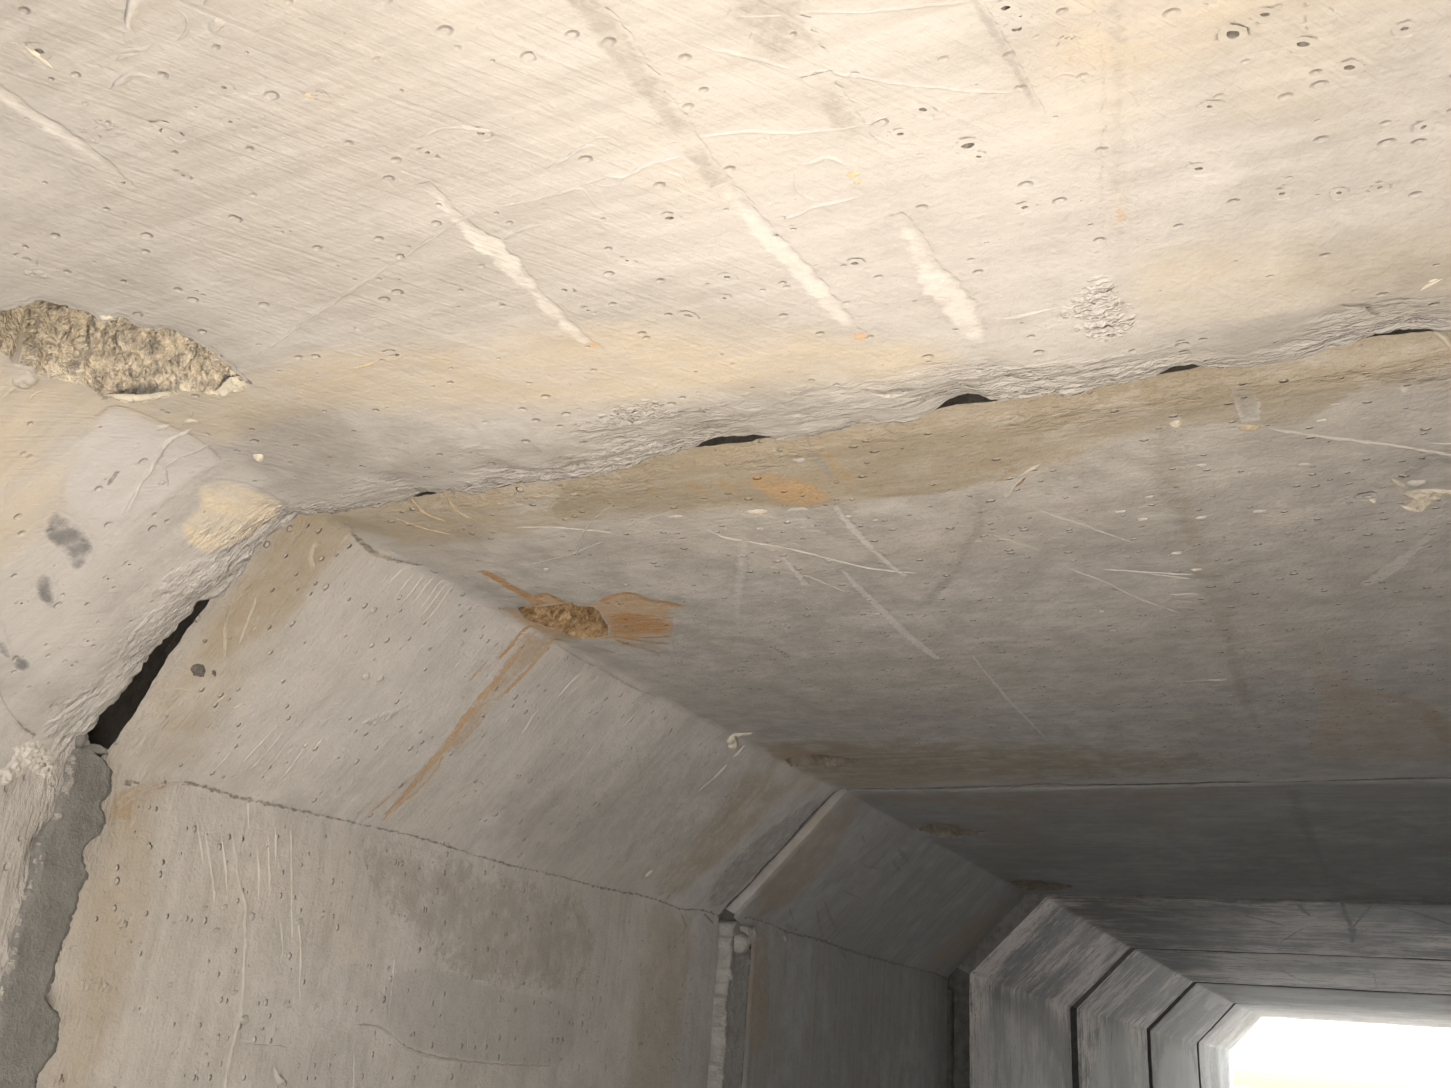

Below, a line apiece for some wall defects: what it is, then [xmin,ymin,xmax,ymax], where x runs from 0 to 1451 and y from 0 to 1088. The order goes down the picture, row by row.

spalling [0,297,252,406]
crack [860,388,926,399]
crack [1269,428,1451,456]
spalling [116,558,231,661]
peeling [191,595,257,677]
crack [336,530,423,567]
spalling [478,570,685,660]
crack [704,528,912,592]
crack [991,507,1202,613]
spalling [0,682,107,785]
rust [360,630,555,823]
crack [121,779,948,1088]